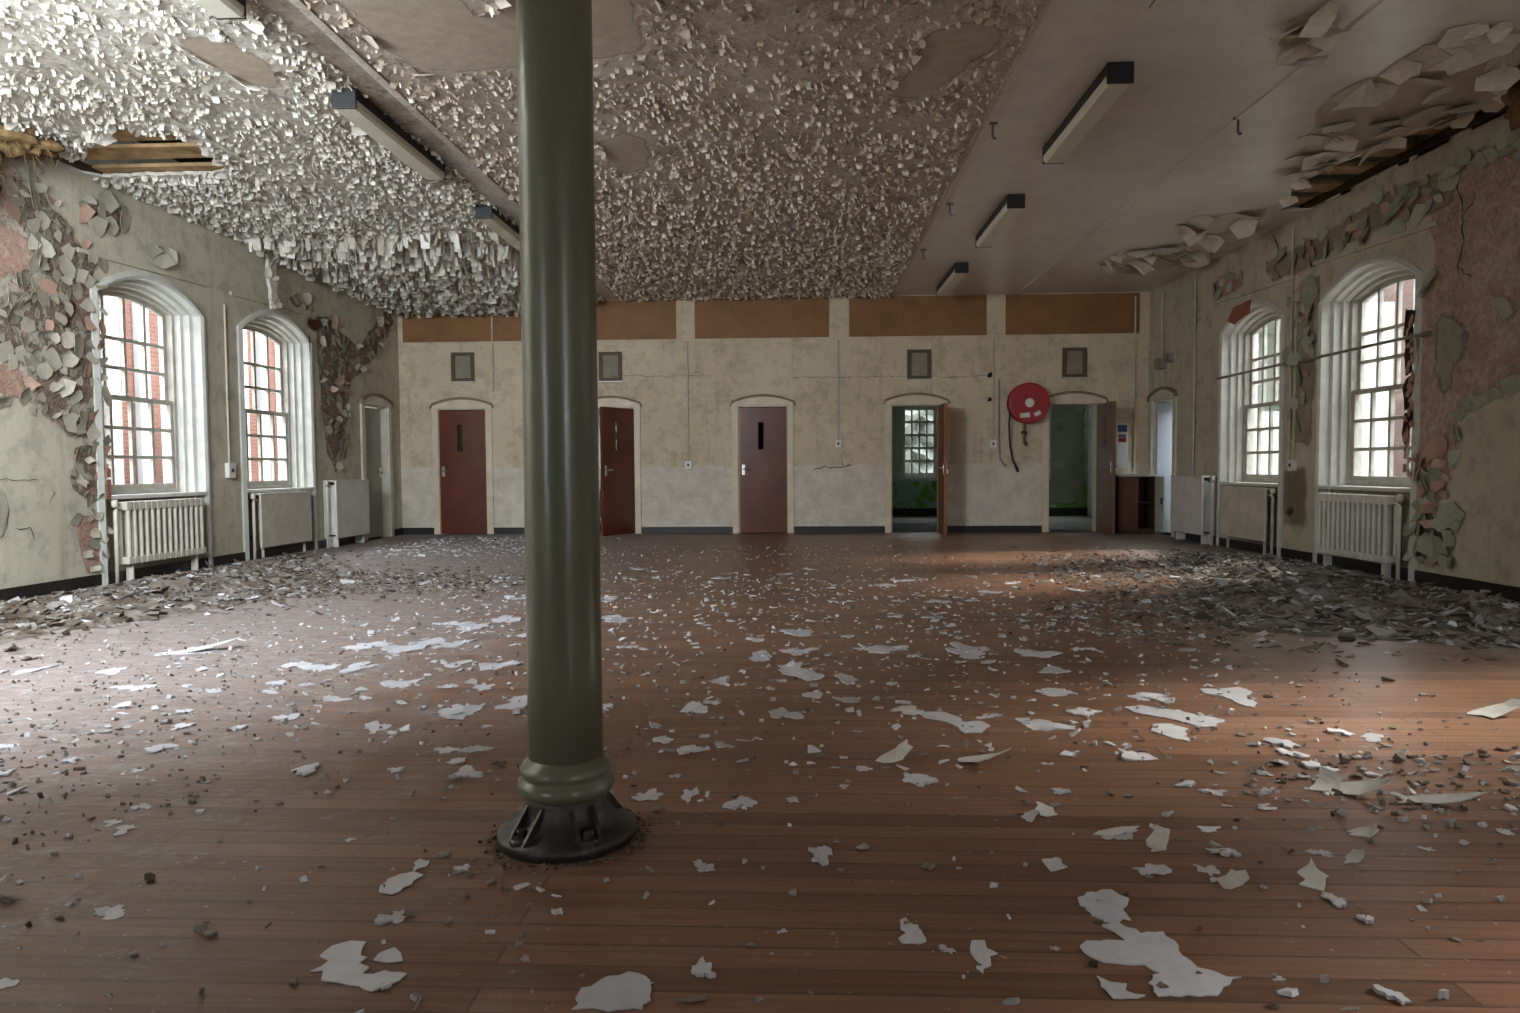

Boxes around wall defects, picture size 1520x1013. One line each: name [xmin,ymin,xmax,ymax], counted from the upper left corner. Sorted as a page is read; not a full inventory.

peeling [592,0,1036,303]
peeling [1270,1,1351,67]
peeling [1274,21,1520,181]
peeling [0,0,521,573]
peeling [1098,209,1266,325]
flaking render [1266,126,1520,569]
crack [0,478,55,542]